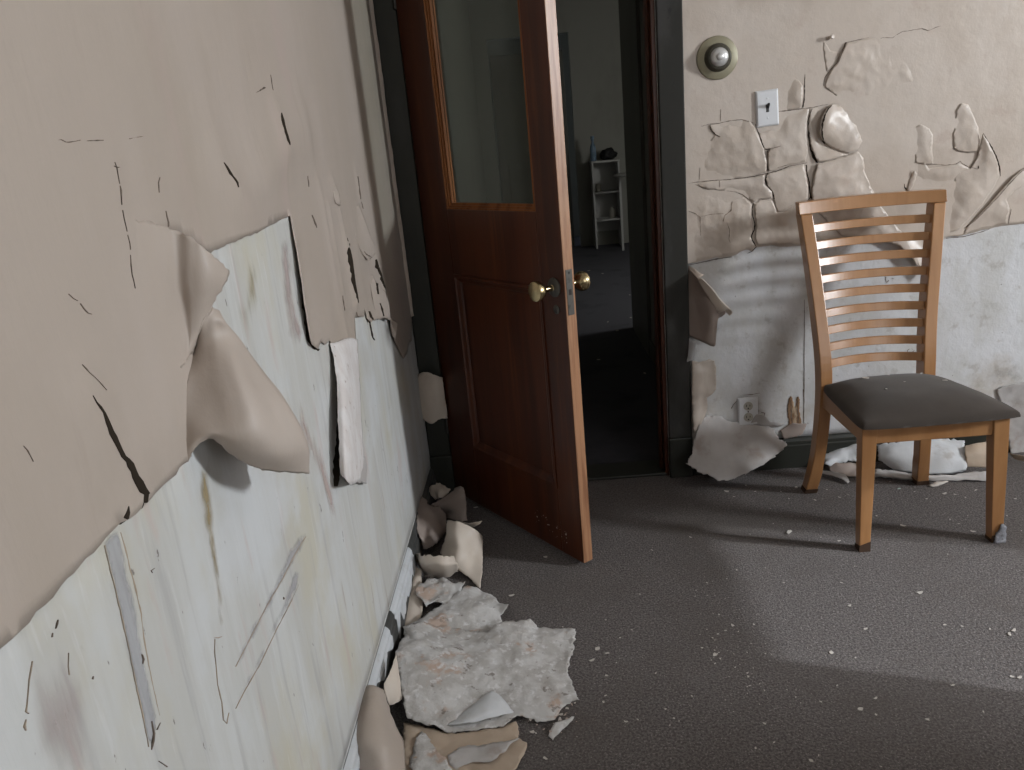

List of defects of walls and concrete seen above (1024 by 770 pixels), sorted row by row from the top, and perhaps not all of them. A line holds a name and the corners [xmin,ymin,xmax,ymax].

crack [60,139,136,288]
crack [224,162,239,187]
crack [281,113,291,145]
crack [689,26,939,265]
peeling [688,245,815,441]
peeling [818,243,922,383]
peeling [936,224,1024,400]
crack [82,364,150,525]
peeling [0,216,430,770]
peeling [829,415,850,434]